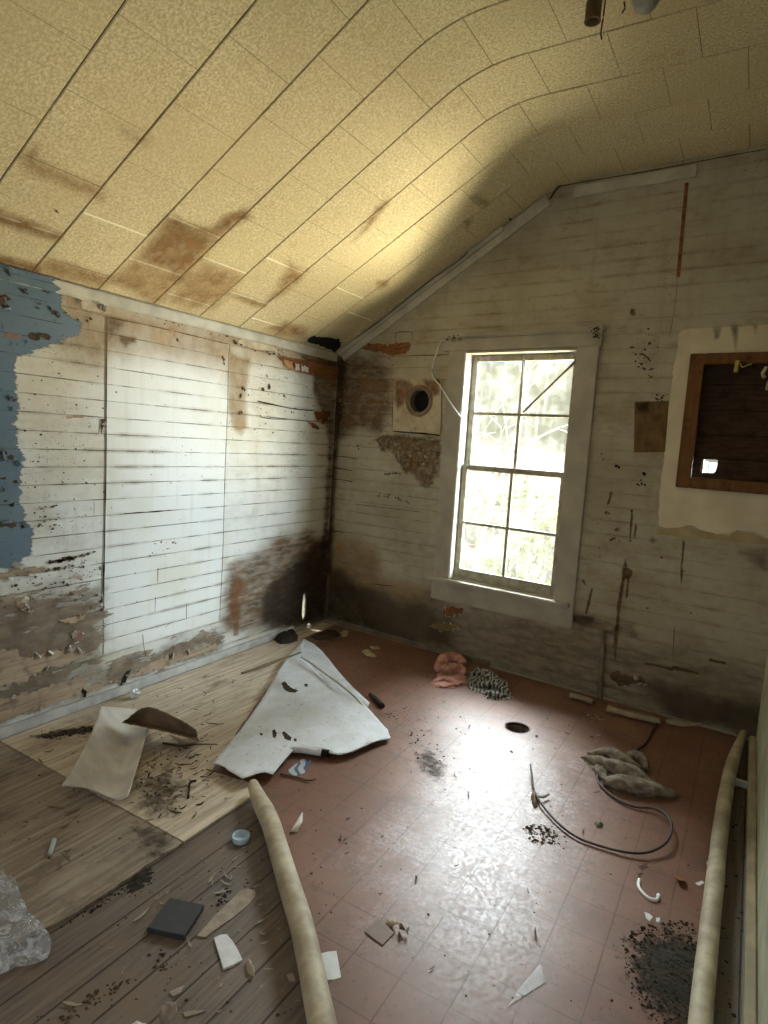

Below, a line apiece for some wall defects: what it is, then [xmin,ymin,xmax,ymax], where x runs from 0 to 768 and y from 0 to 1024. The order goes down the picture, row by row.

water stain [0,215,59,239]
water stain [117,212,248,300]
peeling [46,291,108,322]
peeling [47,404,107,434]
peeling [238,342,441,488]
peeling [23,495,101,533]
water stain [223,354,448,644]
peeling [0,550,225,723]
corrosion [614,562,632,657]